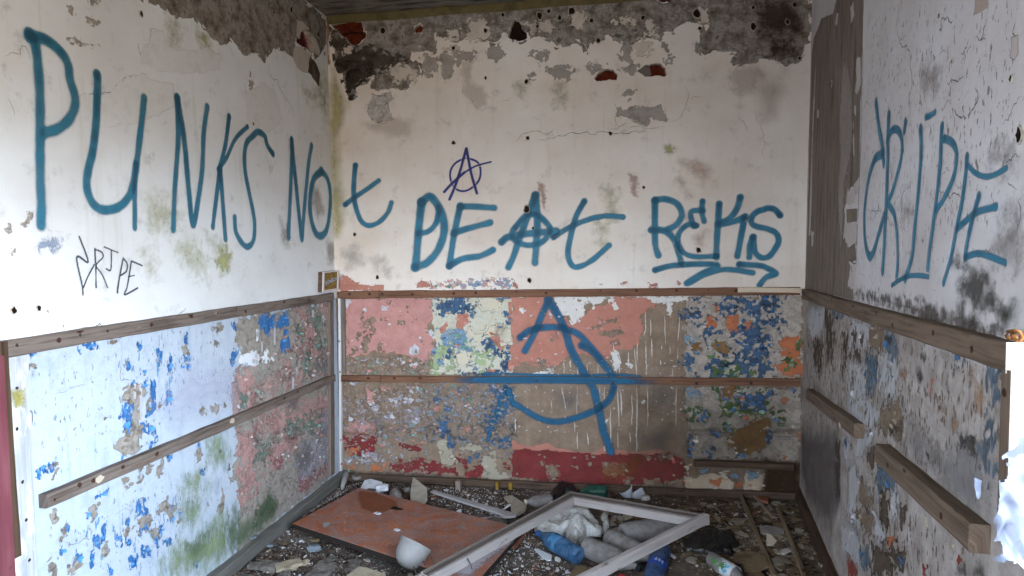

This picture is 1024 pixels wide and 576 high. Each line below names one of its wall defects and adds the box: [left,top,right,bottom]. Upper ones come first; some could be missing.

flaking render [139,0,904,300]
damp [756,0,801,59]
crack [896,1,986,141]
peeling [905,34,1018,167]
damp [856,260,1014,336]
peeling [34,302,333,576]
peeling [338,274,1001,576]